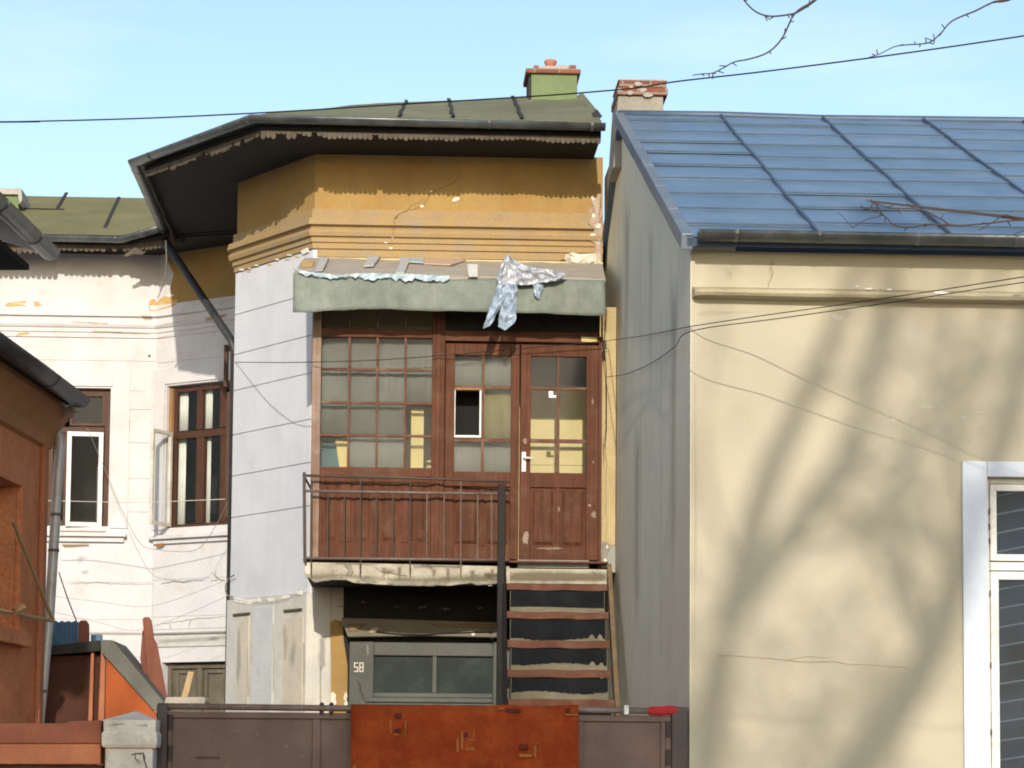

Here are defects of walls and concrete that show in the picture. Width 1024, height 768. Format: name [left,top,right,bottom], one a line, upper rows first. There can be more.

flaking render [588,194,603,262]
flaking render [149,245,309,311]
spalling [311,564,453,586]